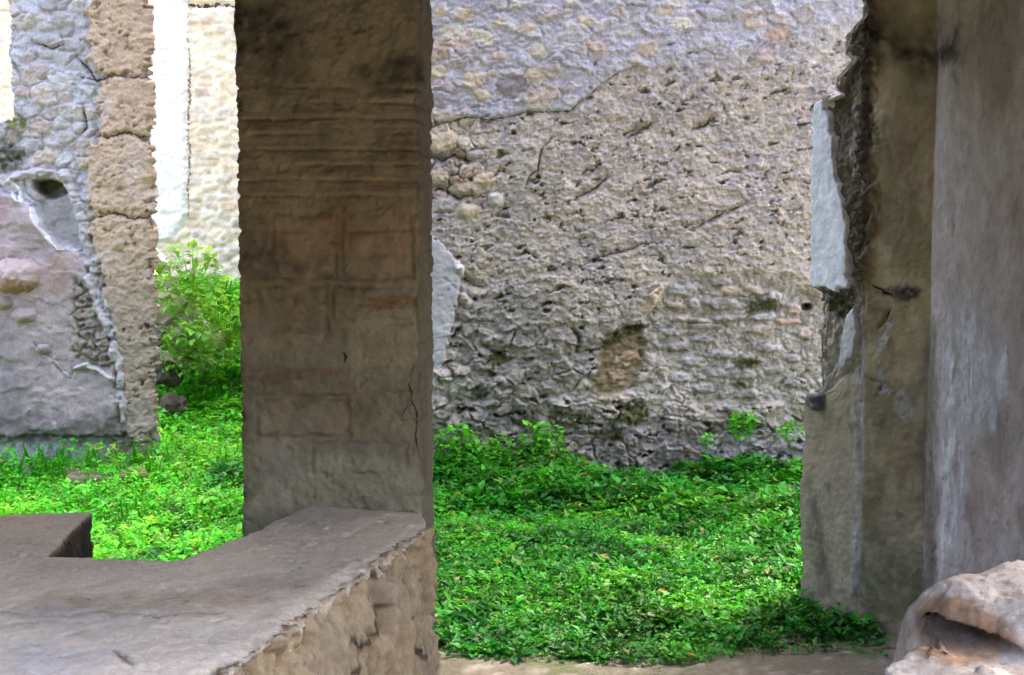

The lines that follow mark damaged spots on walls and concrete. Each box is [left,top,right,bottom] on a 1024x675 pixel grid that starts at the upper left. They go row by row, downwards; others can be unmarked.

crack [35,42,151,82]
crack [434,68,630,123]
crack [434,139,551,200]
flaking render [809,91,855,301]
flaking render [0,166,128,423]
spalling [648,284,665,305]
spalling [589,327,646,395]
crack [402,364,419,457]